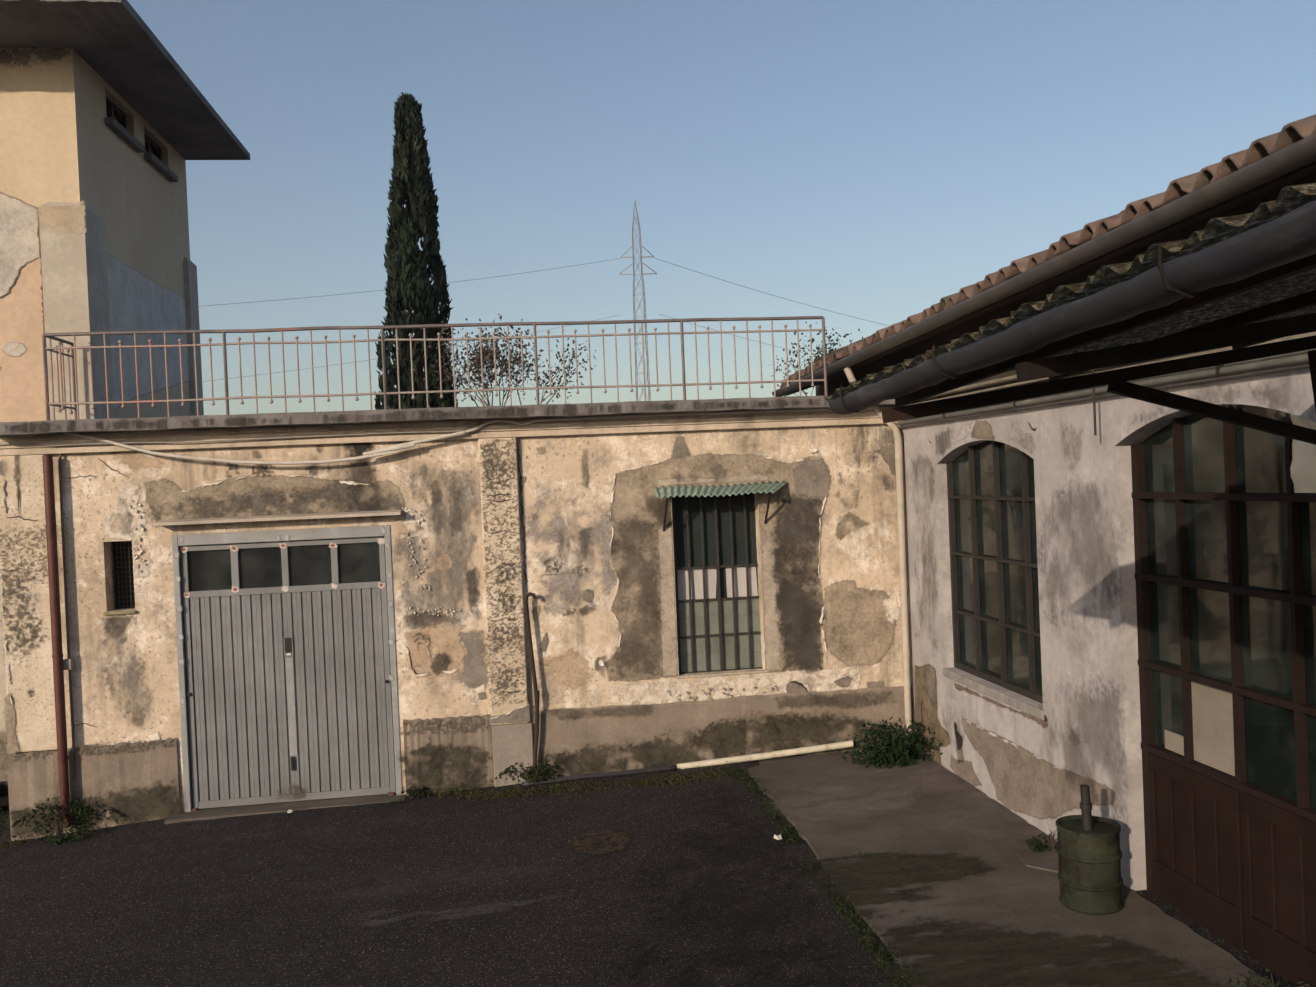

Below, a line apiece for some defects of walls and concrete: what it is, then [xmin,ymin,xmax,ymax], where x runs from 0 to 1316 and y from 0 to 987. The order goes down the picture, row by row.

flaking render [400,439,900,735]
damp [773,458,868,673]
flaking render [914,664,1115,819]